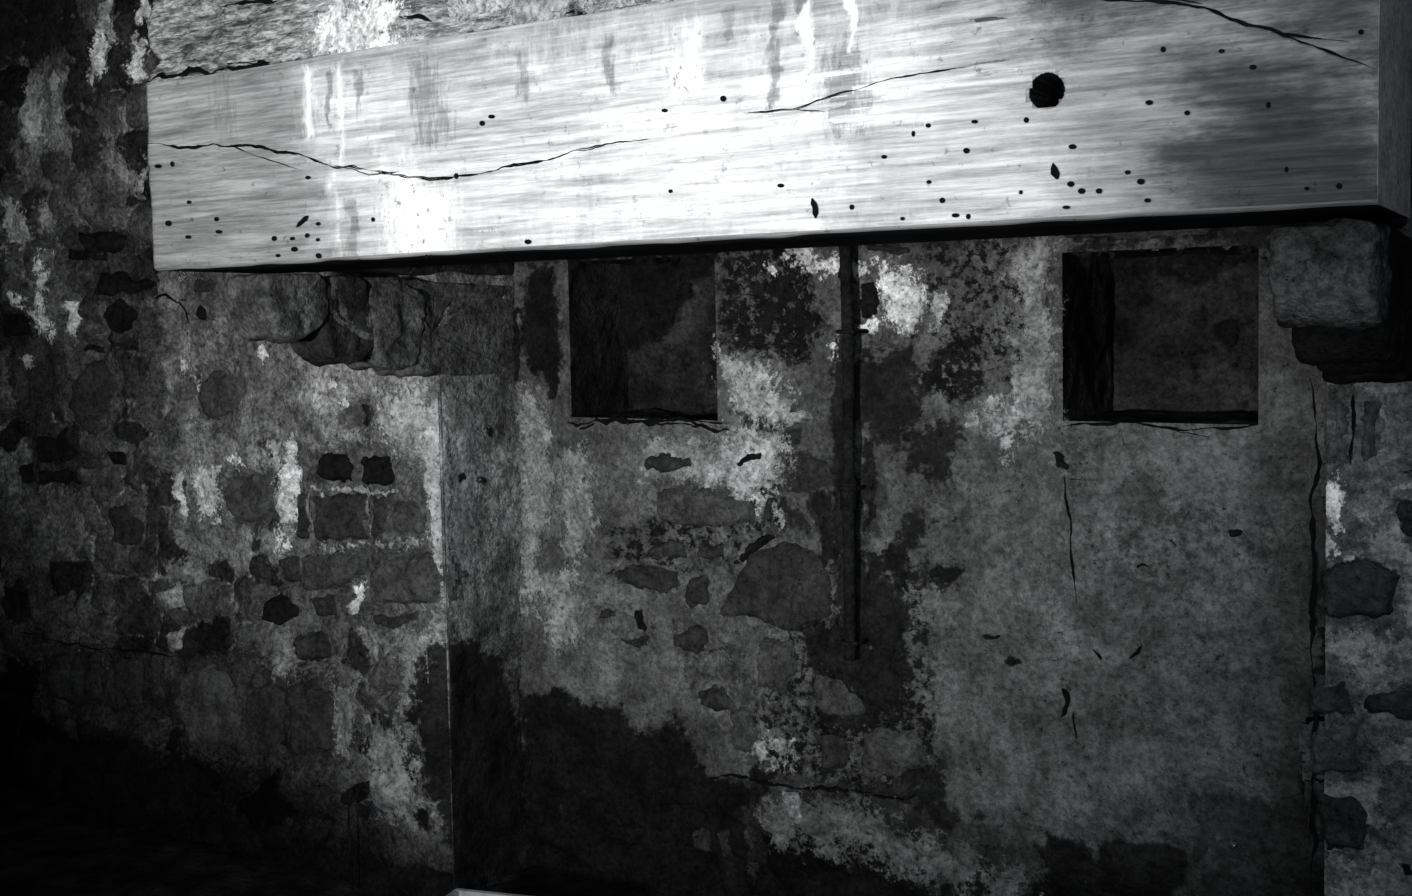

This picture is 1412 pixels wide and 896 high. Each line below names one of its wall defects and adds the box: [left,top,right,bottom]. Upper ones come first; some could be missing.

flaking render [98,106,149,201]
spalling [186,272,227,321]
spalling [0,215,159,561]
spalling [184,357,247,426]
flaking render [155,554,211,611]
spalling [165,395,458,834]
spalling [514,334,1043,896]
damp [747,509,965,808]
damp [1004,656,1021,667]
crack [1308,378,1356,735]
crack [1309,771,1319,896]